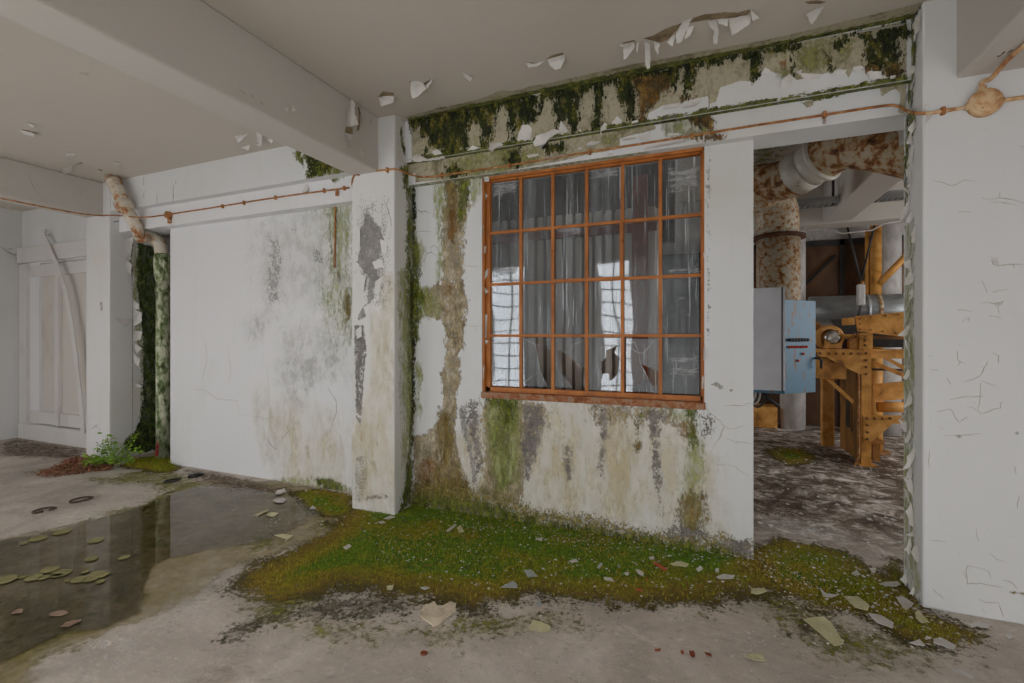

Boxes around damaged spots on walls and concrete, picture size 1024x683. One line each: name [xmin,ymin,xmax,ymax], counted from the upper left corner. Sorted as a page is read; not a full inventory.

peeling [378,91,394,106]
damp [314,199,389,328]
spalling [354,211,388,423]
damp [412,178,481,351]
peeling [396,1,932,563]
damp [412,406,471,505]
damp [589,404,709,534]
crack [928,351,1003,463]
crack [964,529,1016,617]